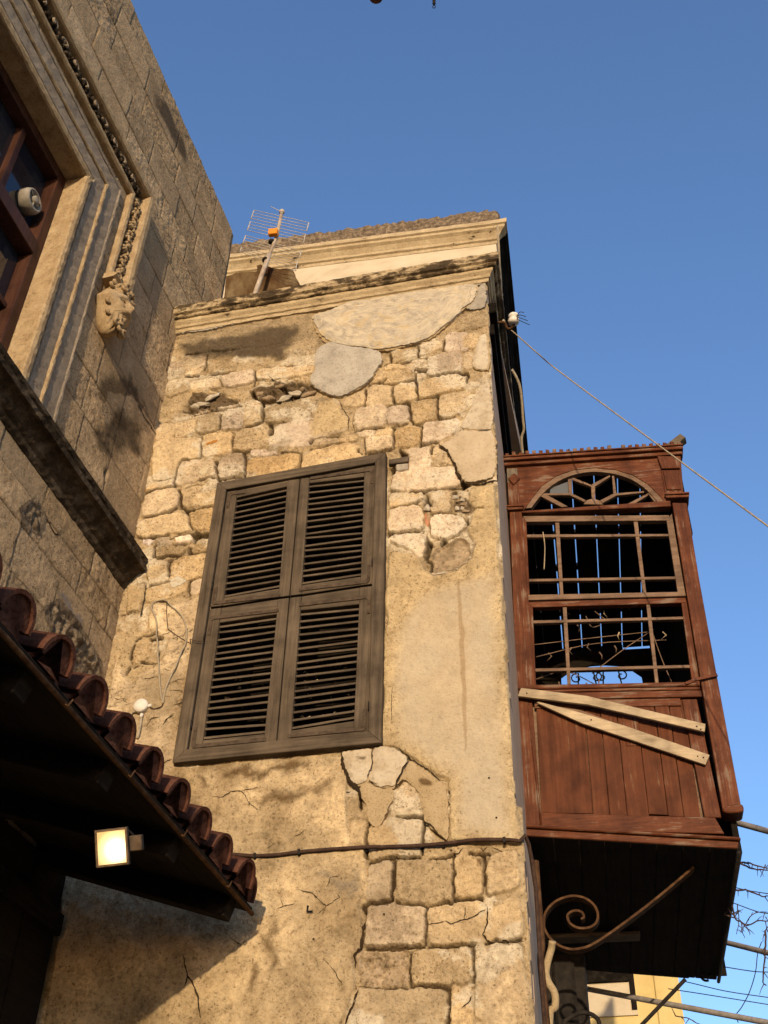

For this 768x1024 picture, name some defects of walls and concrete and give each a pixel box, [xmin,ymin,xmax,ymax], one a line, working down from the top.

spalling [189,392,237,415]
spalling [253,381,317,407]
peeling [439,333,498,514]
crack [439,429,498,491]
peeling [342,746,449,841]
crack [276,876,340,914]
crack [183,955,201,1018]
spalling [356,950,410,988]